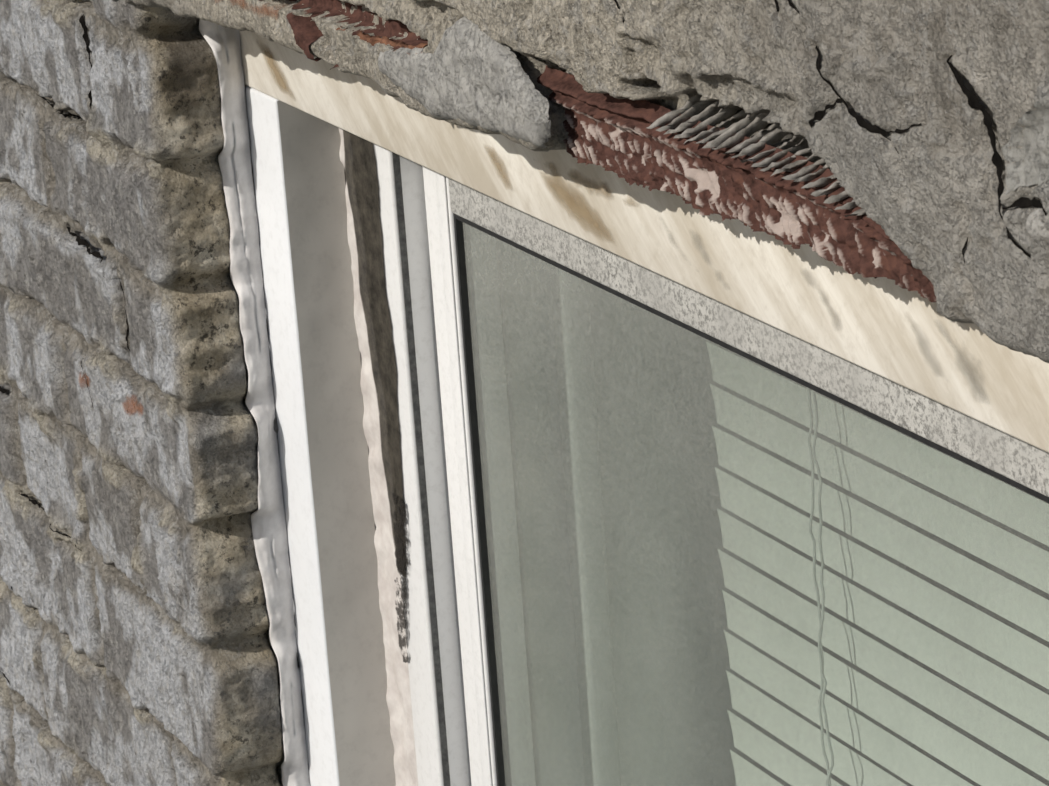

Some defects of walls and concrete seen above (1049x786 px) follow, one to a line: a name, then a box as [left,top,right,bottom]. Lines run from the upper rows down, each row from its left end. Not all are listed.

crack [79,14,92,109]
corrosion [286,0,428,62]
crack [774,0,799,13]
crack [808,45,921,154]
corrosion [537,65,936,302]
crack [947,55,1047,257]
damp [343,130,409,663]